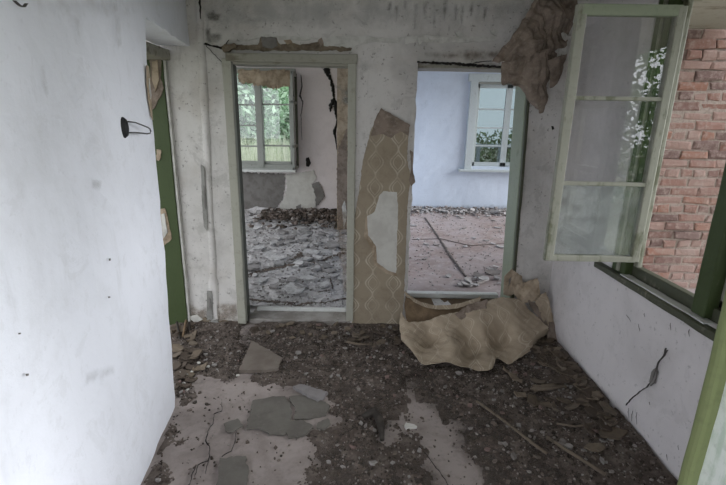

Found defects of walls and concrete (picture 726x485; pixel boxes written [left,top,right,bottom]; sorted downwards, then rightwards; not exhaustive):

flaking render [222,36,352,53]
peeling [146,59,164,120]
crack [323,68,337,149]
flaking render [242,157,325,210]
peeling [160,208,172,245]
peeling [364,191,398,276]
crack [626,348,668,405]
crack [188,402,236,485]